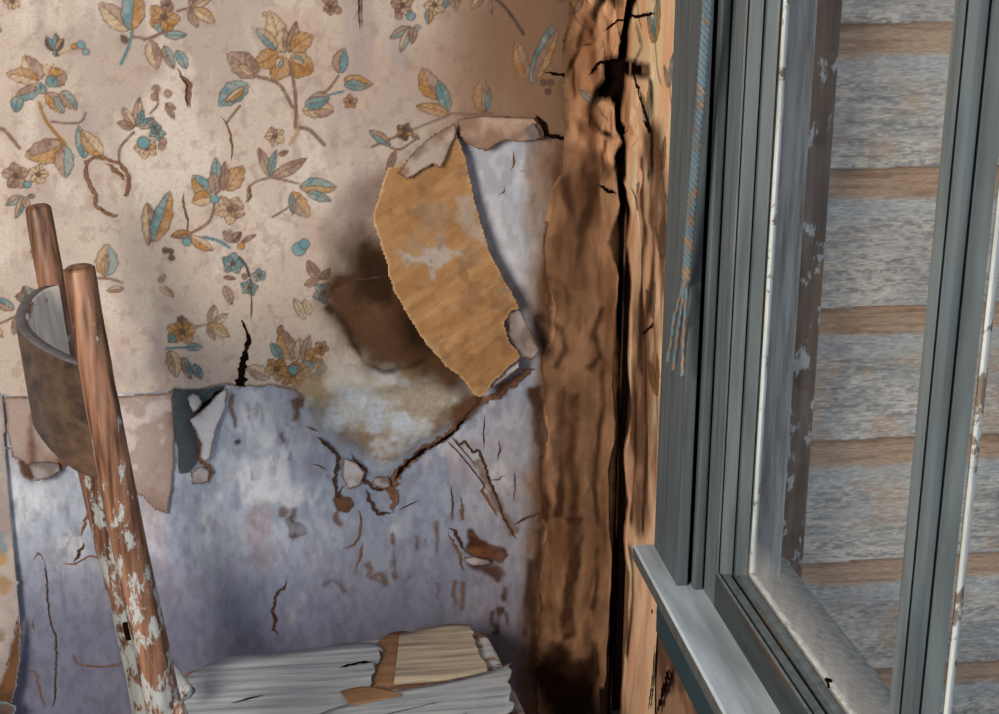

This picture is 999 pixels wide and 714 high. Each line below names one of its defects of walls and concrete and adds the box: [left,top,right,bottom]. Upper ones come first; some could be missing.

peeling [458,116,544,151]
crack [535,114,564,140]
crack [235,275,252,387]
leakage [324,230,463,391]
crack [544,0,654,714]
peeling [3,397,67,481]
peeling [118,385,228,514]
crack [447,416,516,500]
flaking render [333,495,354,525]
flaking render [448,528,507,582]
crack [31,513,122,707]
crack [271,583,287,635]